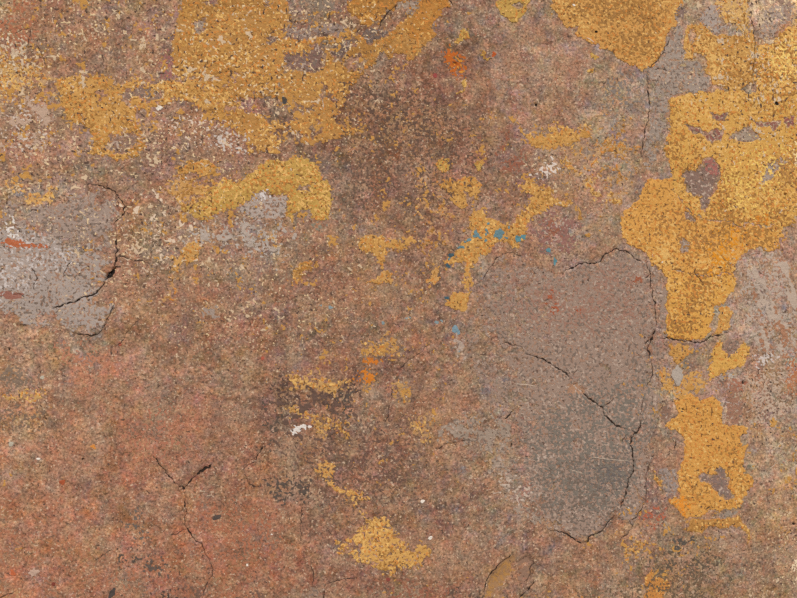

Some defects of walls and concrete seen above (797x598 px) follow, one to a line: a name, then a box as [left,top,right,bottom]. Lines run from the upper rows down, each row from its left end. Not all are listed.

crack [55,183,165,308]
crack [502,248,727,543]
crack [156,458,213,598]